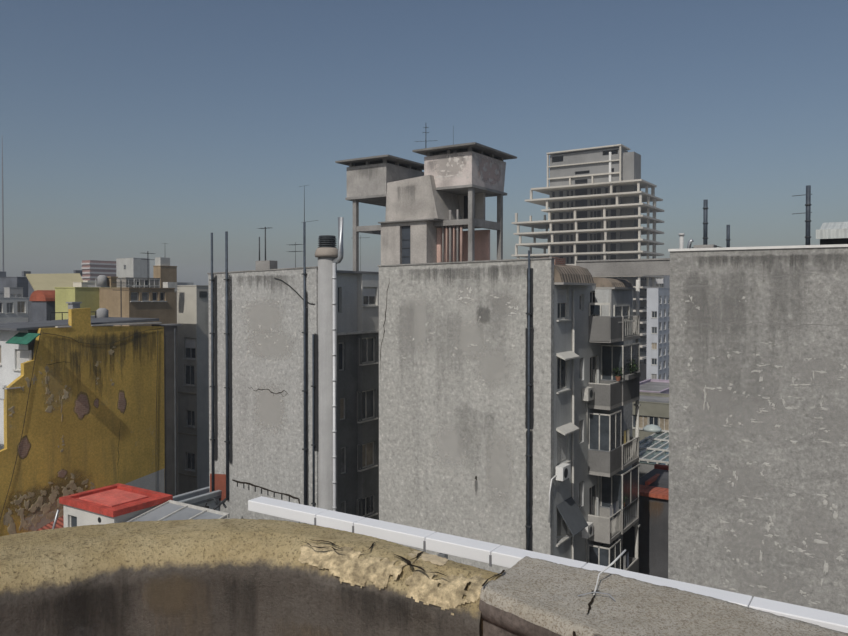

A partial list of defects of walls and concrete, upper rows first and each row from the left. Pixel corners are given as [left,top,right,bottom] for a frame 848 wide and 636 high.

flaking render [21,360,99,420]
flaking render [17,435,31,460]
peeling [3,469,95,534]
crack [302,539,377,552]
crack [394,551,447,576]